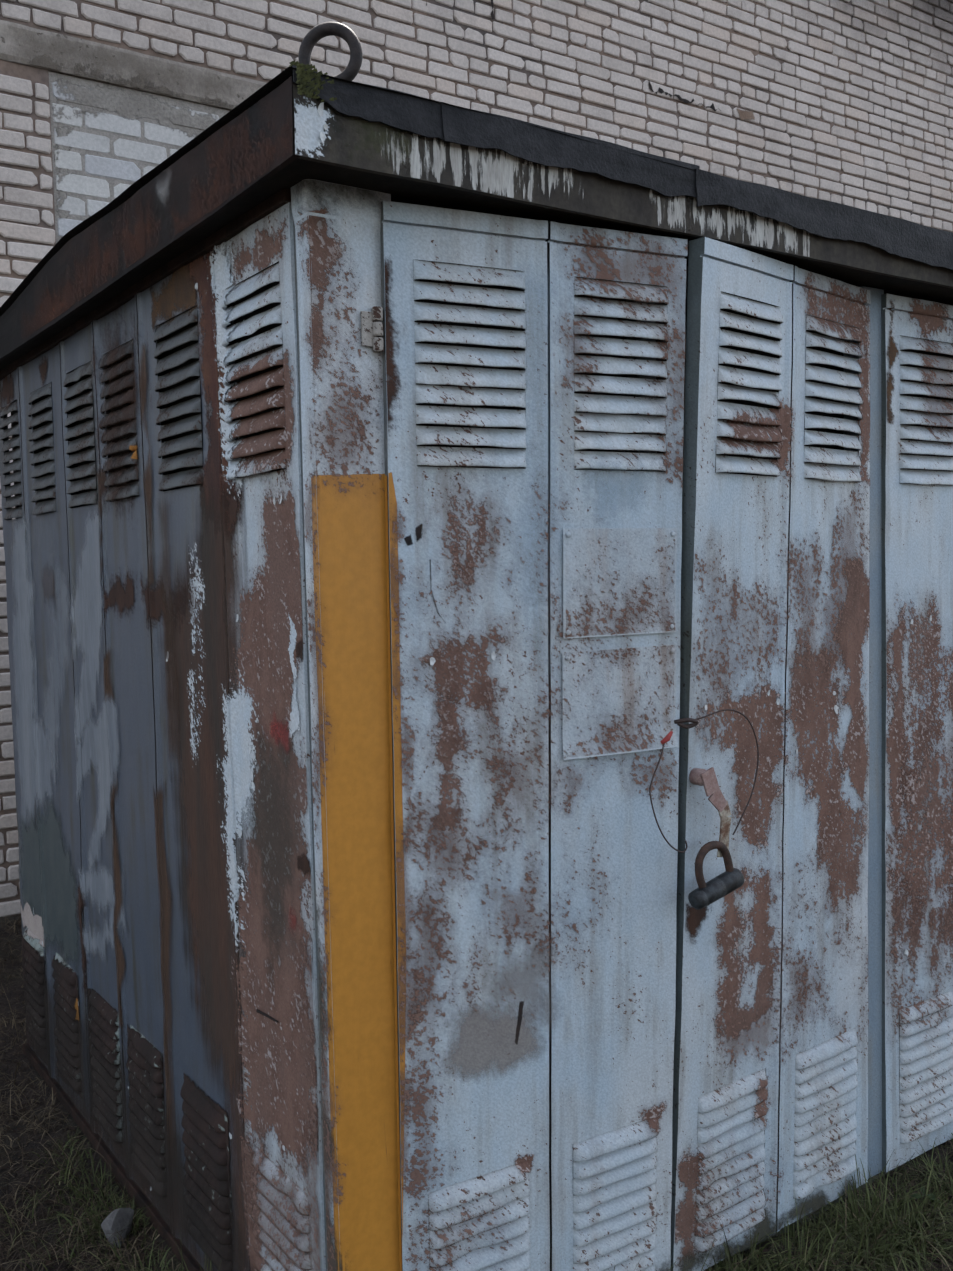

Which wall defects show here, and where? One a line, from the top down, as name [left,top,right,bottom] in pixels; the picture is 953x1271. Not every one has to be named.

peeling [381,133,584,202]
peeling [650,190,810,257]
rust [887,298,953,449]
peeling [187,543,206,767]
peeling [216,669,259,953]
rust [21,207,688,1271]
rust [686,272,870,1069]
peeling [20,902,46,947]
rust [753,1079,771,1127]
rust [675,1143,784,1267]